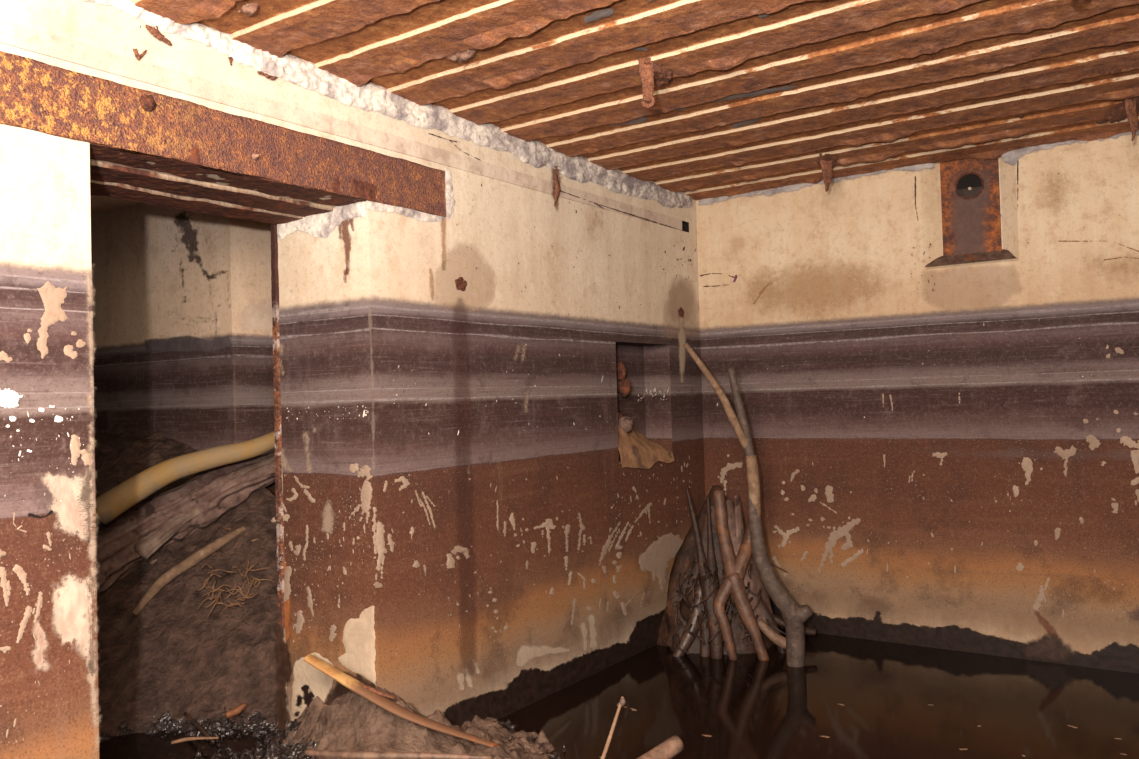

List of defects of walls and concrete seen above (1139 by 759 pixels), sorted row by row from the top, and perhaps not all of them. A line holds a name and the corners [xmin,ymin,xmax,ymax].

peeling [83,0,934,240]
rust [637,61,673,88]
rust [1096,96,1139,124]
rust [552,166,561,207]
rust [338,218,354,282]
flaking render [24,271,93,364]
flaking render [43,381,97,595]
water stain [274,624,376,732]
flaking render [292,606,376,718]
water stain [443,608,666,727]
water stain [768,594,785,629]
water stain [804,611,1139,674]